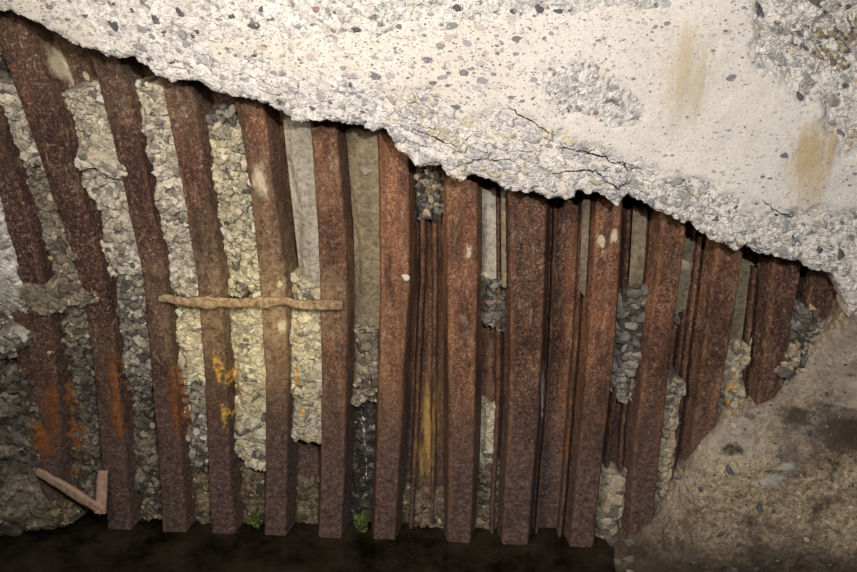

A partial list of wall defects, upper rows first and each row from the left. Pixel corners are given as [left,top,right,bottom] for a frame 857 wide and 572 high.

spalling [29,0,857,318]
crack [509,107,643,190]
spalling [0,197,27,324]
rust [31,377,88,485]
rust [108,356,130,439]
rust [167,364,193,439]
rust [213,357,243,391]
rust [415,380,440,492]